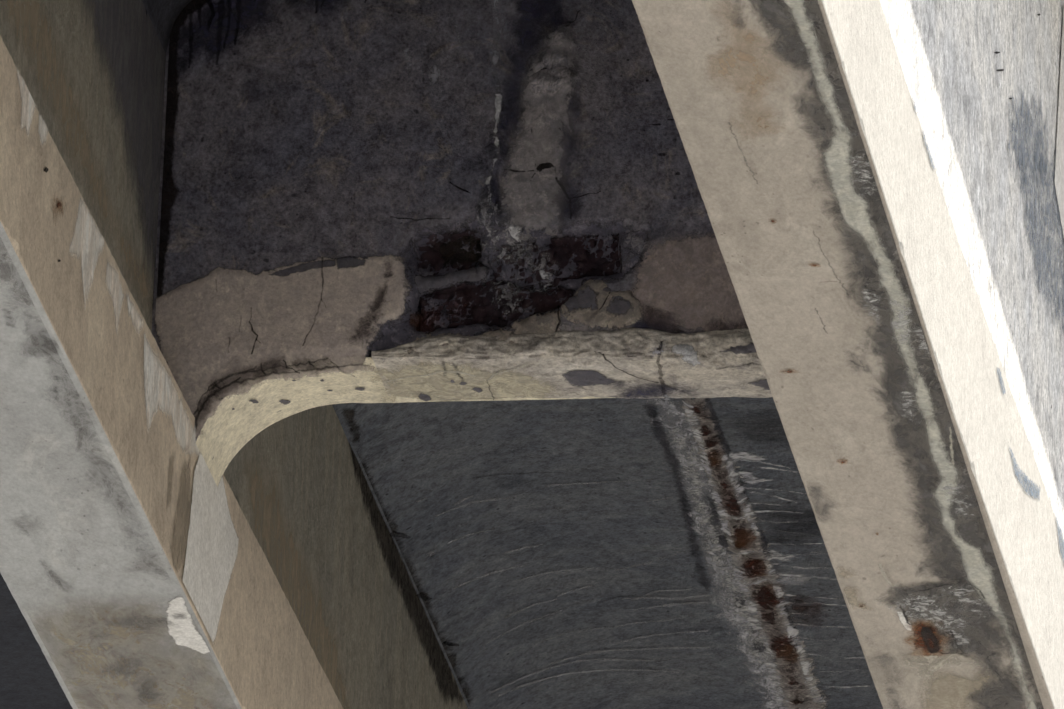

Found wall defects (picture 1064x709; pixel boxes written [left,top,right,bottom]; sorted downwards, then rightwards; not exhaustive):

leakage [52,202,239,709]
leakage [87,0,276,297]
crack [194,257,360,429]
leakage [344,410,470,705]
peeling [155,23,746,438]
crack [595,342,669,400]
leakage [618,382,788,709]
leakage [719,342,760,366]
spalling [682,398,829,709]
leakage [750,0,1044,709]